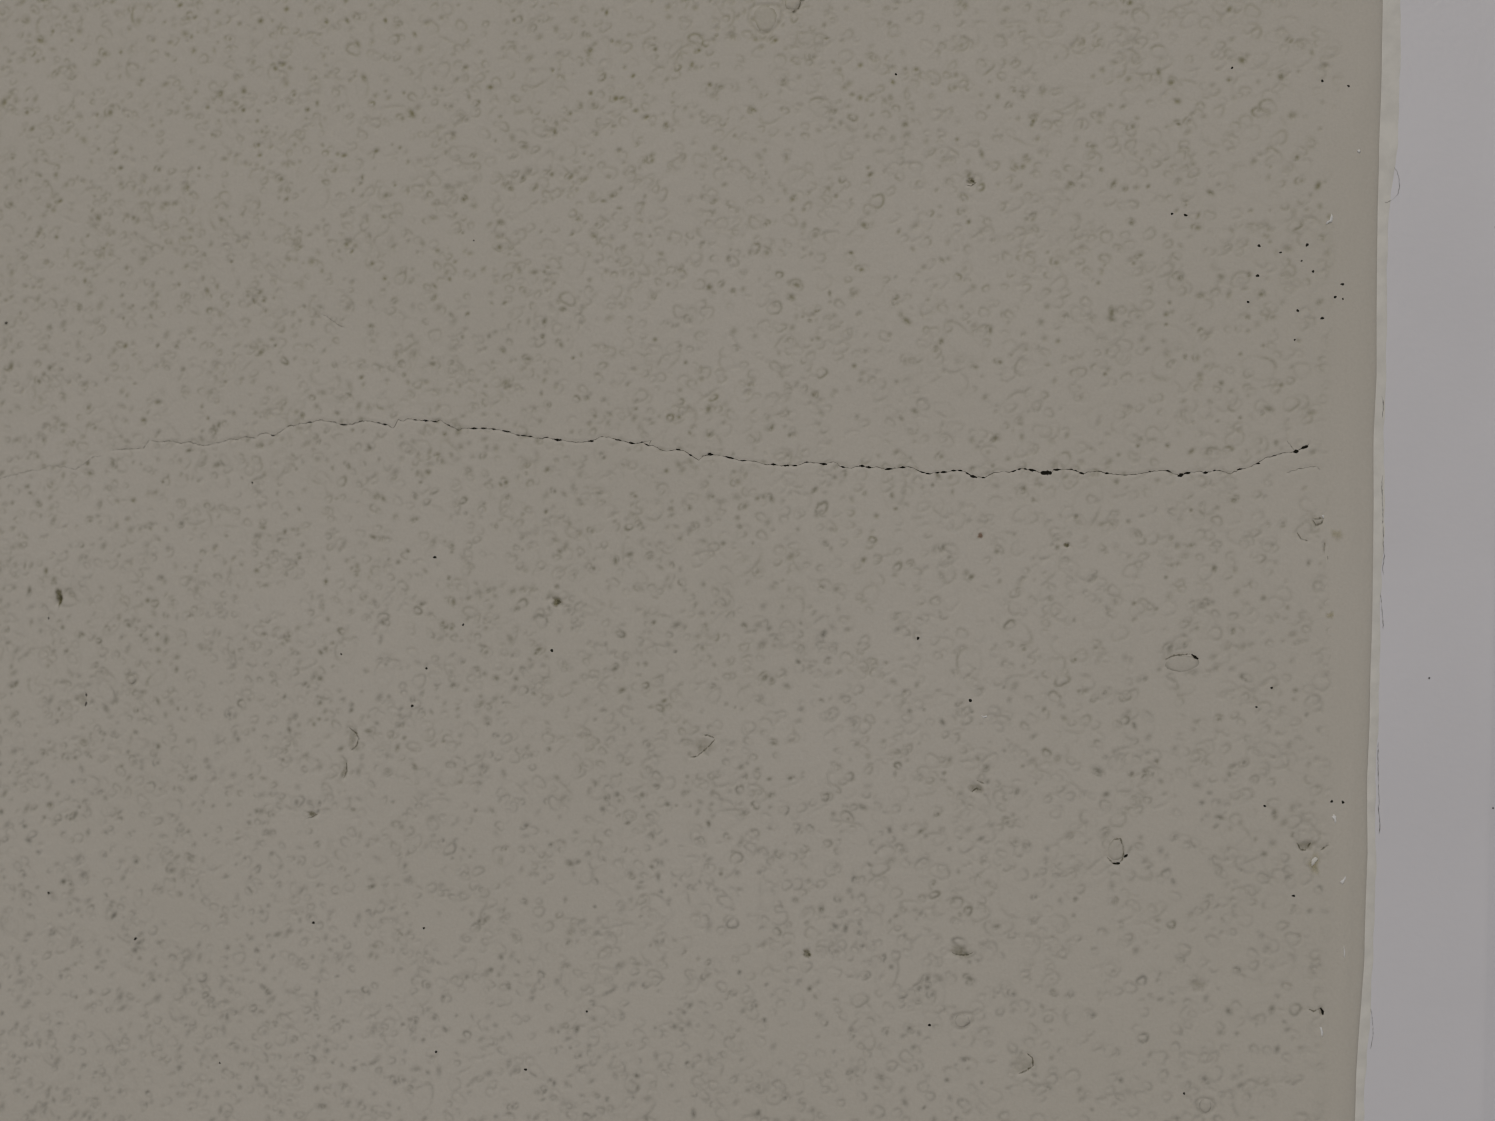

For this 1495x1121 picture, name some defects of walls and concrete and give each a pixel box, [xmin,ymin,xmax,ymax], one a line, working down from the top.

crack [138,418,1309,478]